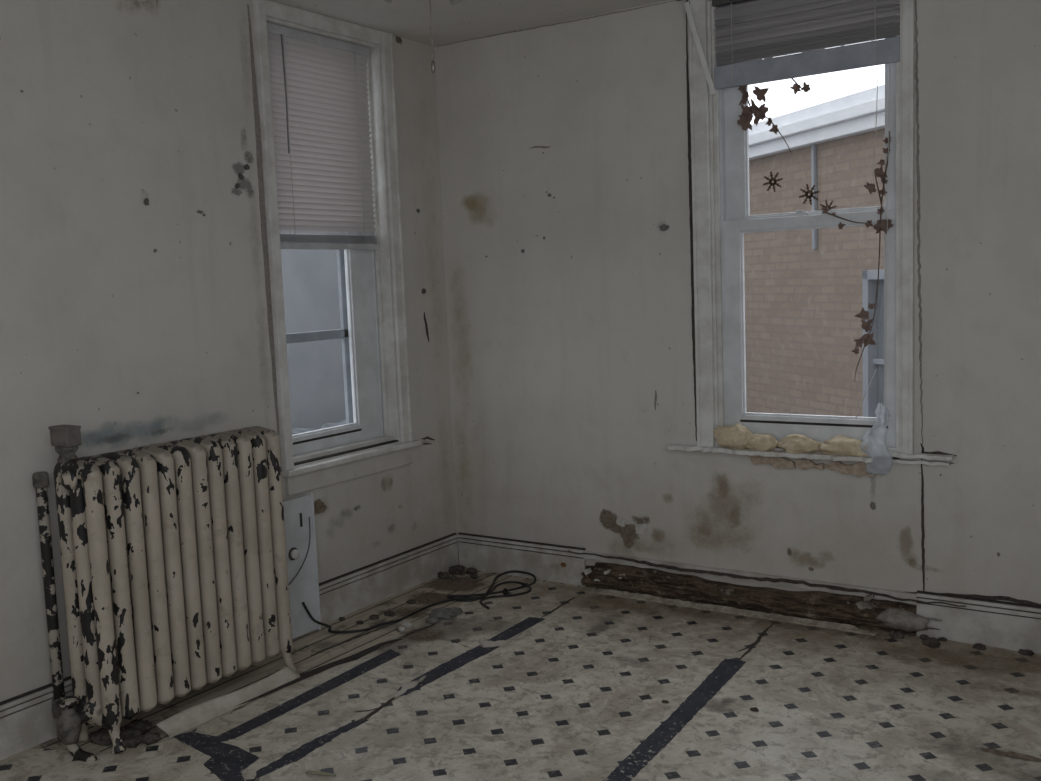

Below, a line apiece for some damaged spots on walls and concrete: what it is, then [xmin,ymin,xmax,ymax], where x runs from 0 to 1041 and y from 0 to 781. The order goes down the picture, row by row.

crack [568,0,1041,607]
flaking render [746,455,875,477]
flaking render [600,509,649,548]